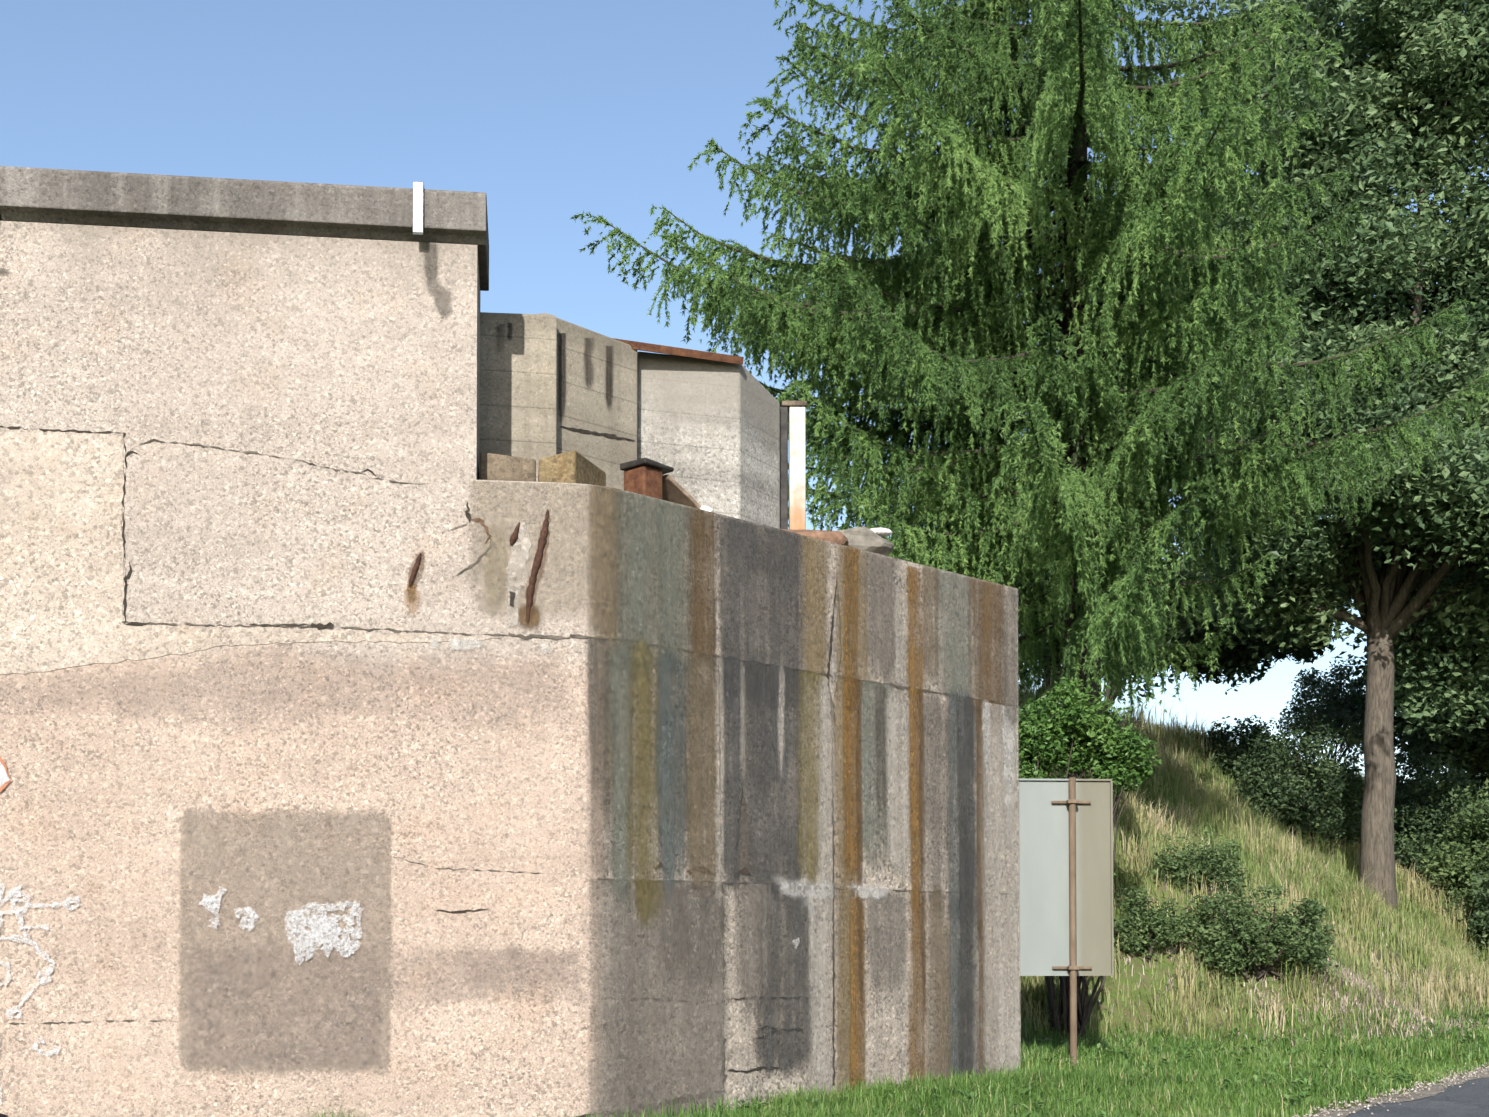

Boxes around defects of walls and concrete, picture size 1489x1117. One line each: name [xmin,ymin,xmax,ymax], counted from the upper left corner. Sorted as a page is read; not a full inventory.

leakage [426,242,450,315]
crack [0,426,492,626]
crack [249,622,334,630]
leakage [474,481,557,612]
spalling [507,509,550,628]
leakage [534,483,833,1117]
rust [799,535,867,1090]
leakage [863,552,908,864]
rust [907,566,925,1084]
leakage [923,565,1020,1082]
leakage [857,886,905,987]